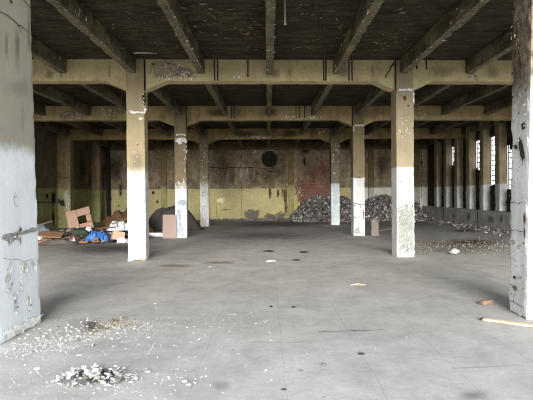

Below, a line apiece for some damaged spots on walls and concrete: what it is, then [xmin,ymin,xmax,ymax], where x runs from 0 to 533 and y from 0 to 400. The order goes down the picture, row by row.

peeling [150,34,204,81]
spalling [513,138,525,166]
flaking render [294,178,330,209]
spalling [2,227,39,246]
peeling [0,261,43,343]